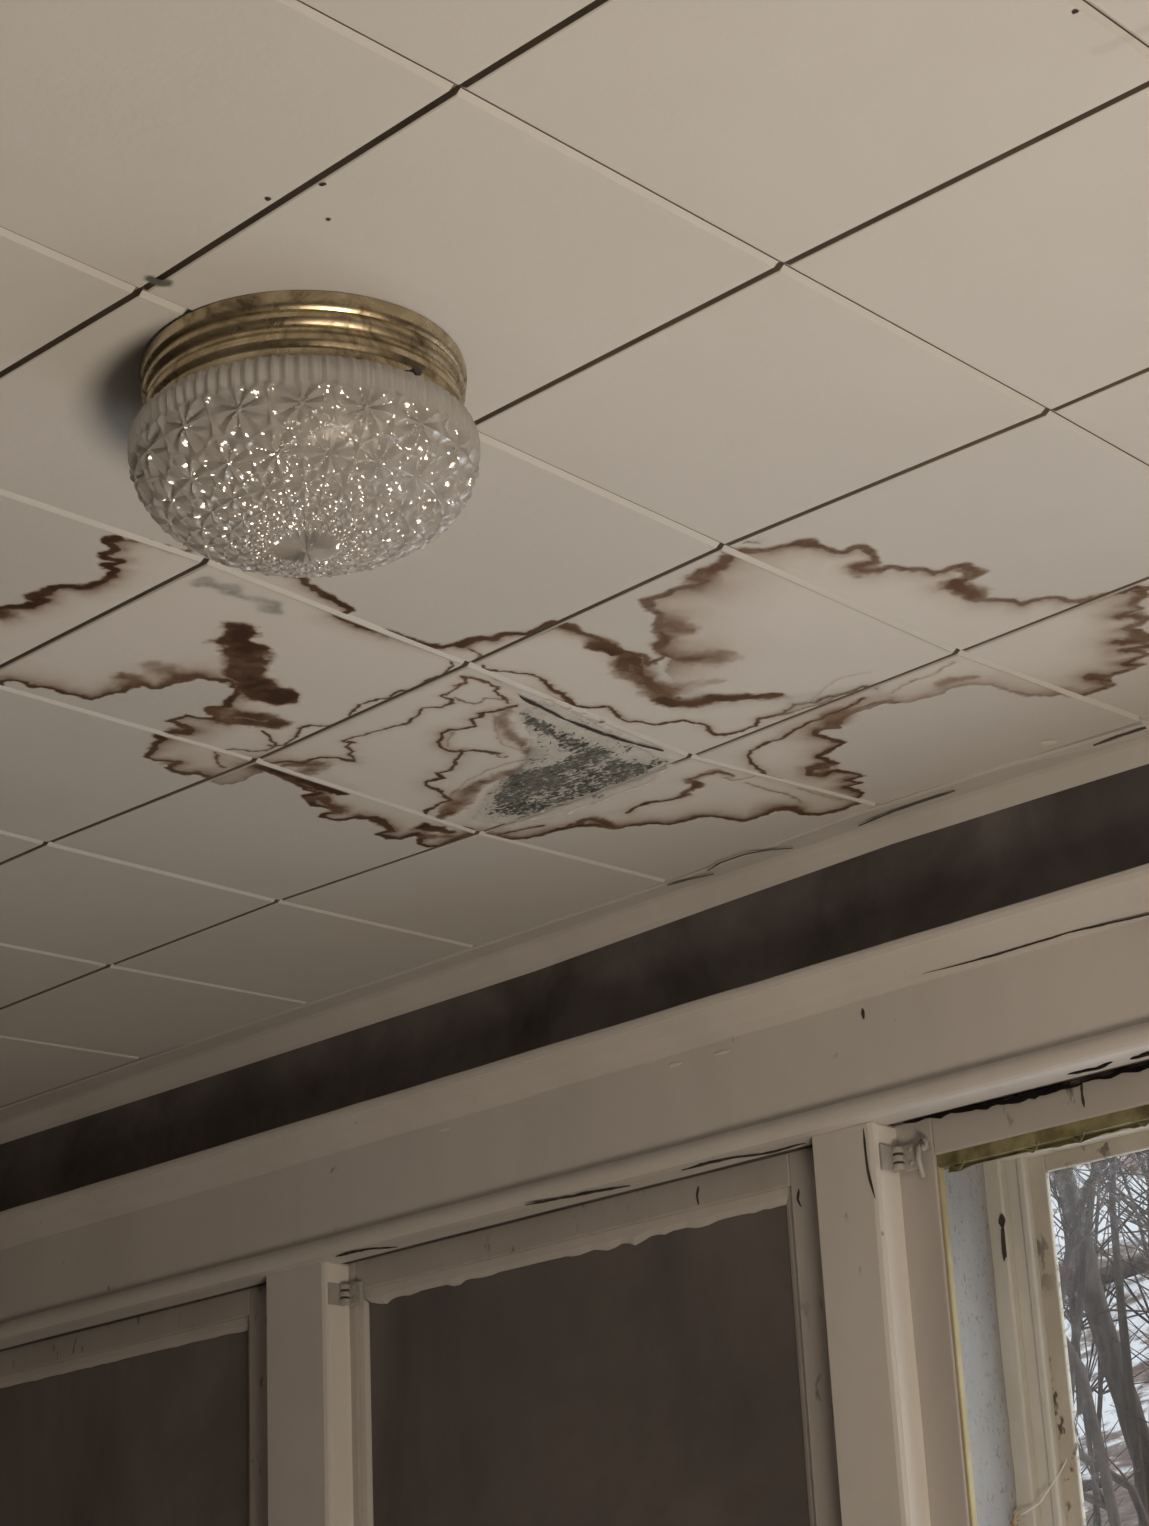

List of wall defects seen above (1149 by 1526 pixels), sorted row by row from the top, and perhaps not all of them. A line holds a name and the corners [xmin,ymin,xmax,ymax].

leakage [0,535,1149,848]